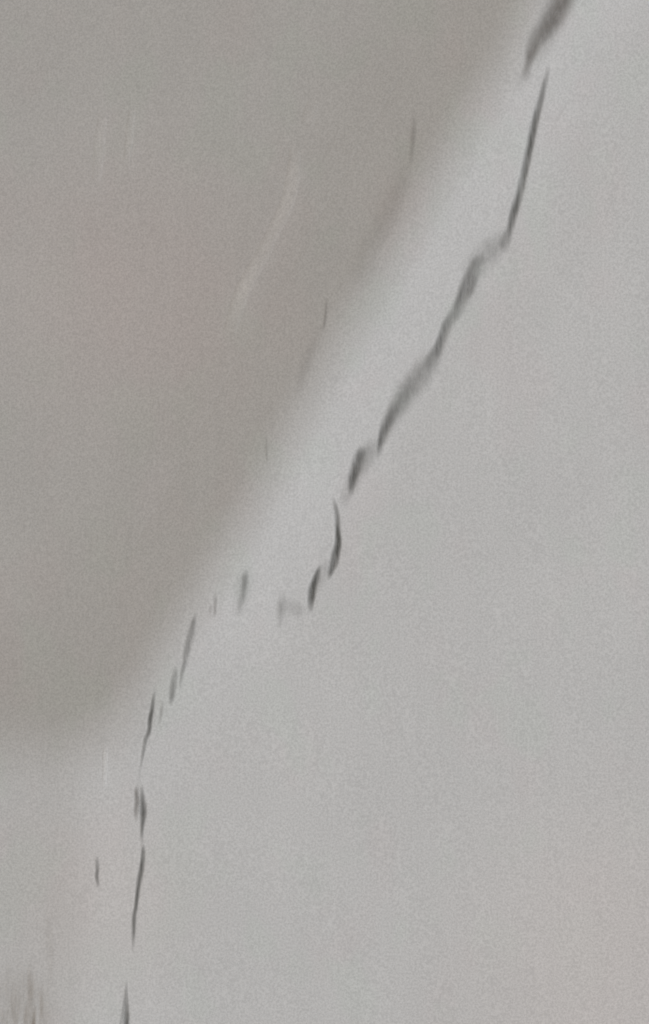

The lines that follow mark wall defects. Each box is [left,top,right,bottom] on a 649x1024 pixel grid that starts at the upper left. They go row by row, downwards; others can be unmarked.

crack [527,116,536,158]
crack [310,525,340,600]
crack [133,859,143,924]